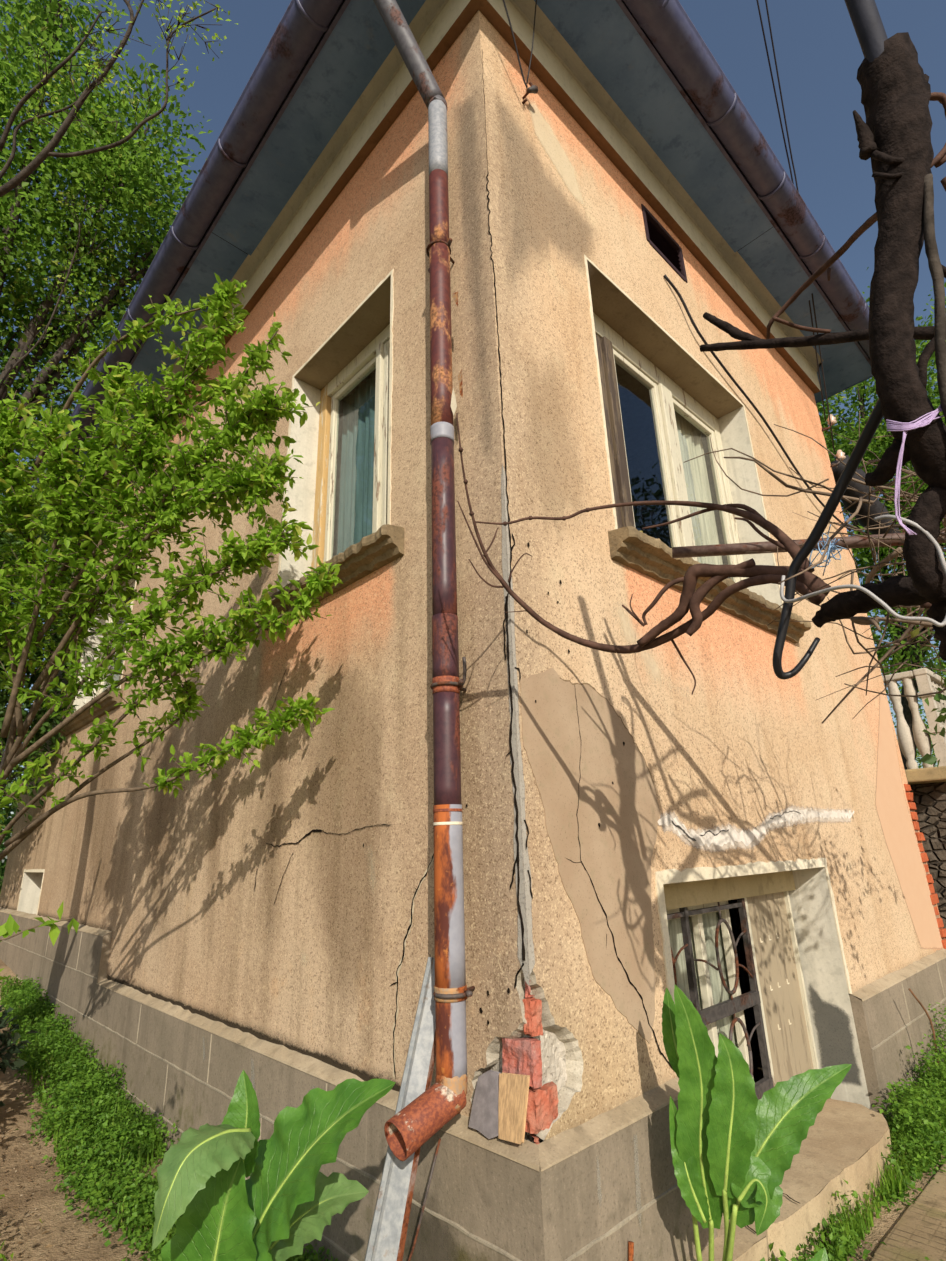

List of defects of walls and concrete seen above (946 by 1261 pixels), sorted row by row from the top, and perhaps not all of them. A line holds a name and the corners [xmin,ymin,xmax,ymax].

crack [482,52,533,989]
crack [254,824,389,903]
spalling [470,464,583,1145]
crack [672,821,729,841]
crack [390,851,434,1080]
corrosion [425,1030,436,1091]
corrosion [397,1147,421,1261]